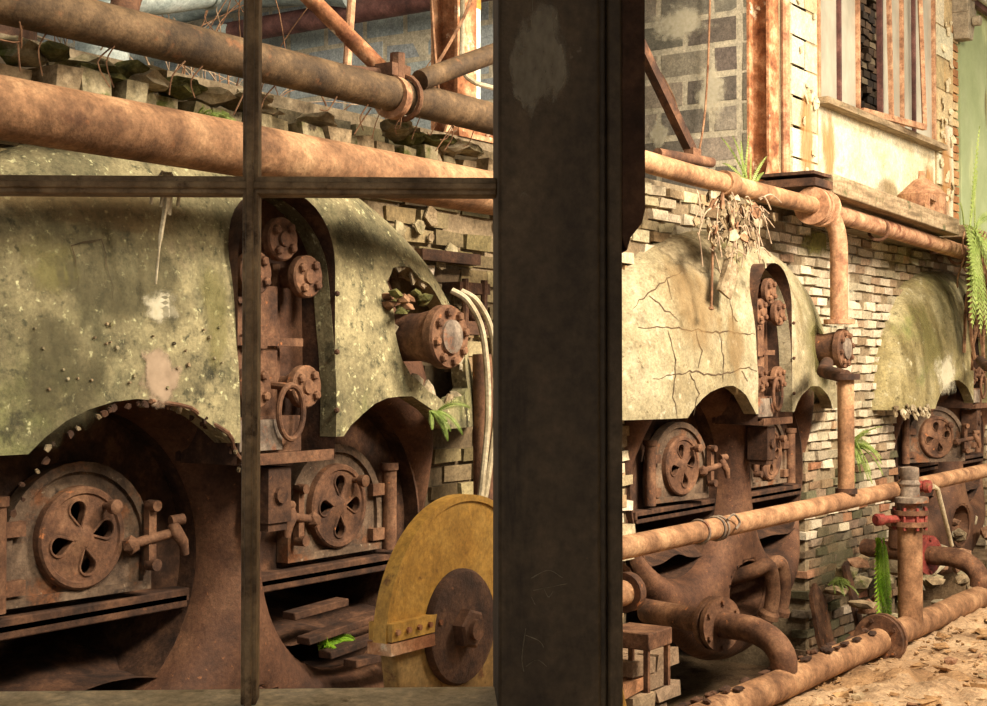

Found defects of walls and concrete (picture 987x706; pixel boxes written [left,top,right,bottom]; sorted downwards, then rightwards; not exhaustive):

peeling [941,21,956,147]
leakage [6,196,147,223]
rust [801,99,835,174]
rust [926,137,951,209]
peeling [941,158,955,201]
leakage [66,257,178,320]
leakage [29,319,101,414]
crack [633,274,756,418]
leakage [938,301,963,389]